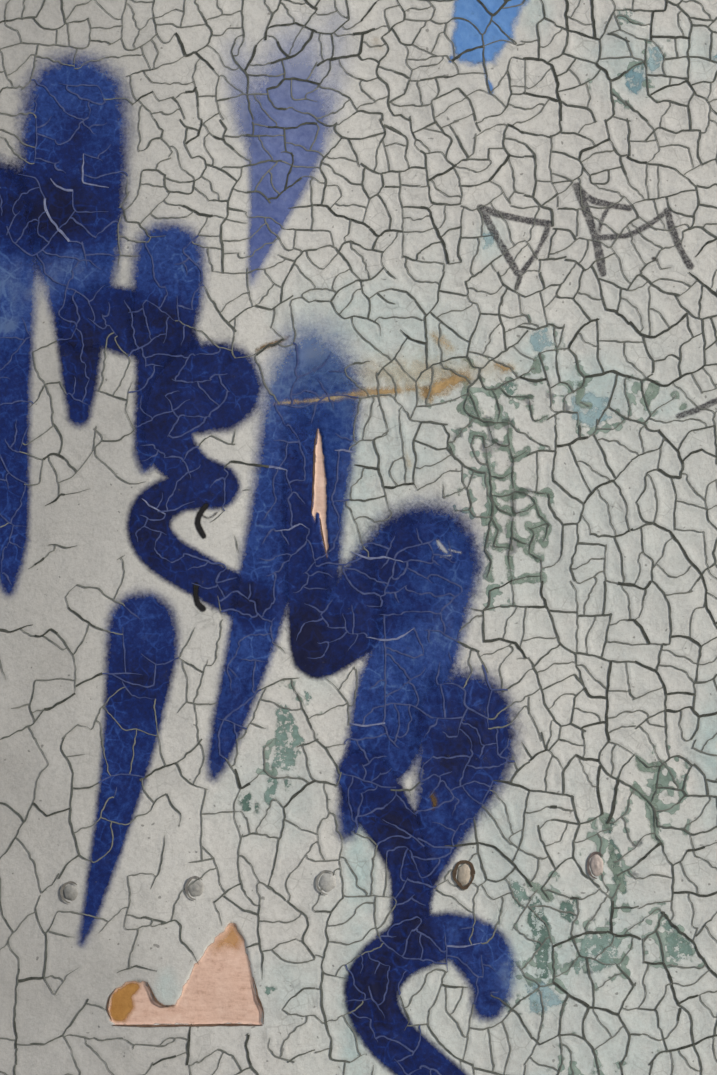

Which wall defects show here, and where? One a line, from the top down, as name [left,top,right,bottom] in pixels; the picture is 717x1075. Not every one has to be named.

crack [0,0,717,691]
rust [314,374,466,401]
peeling [311,429,328,557]
peeling [107,923,275,1027]